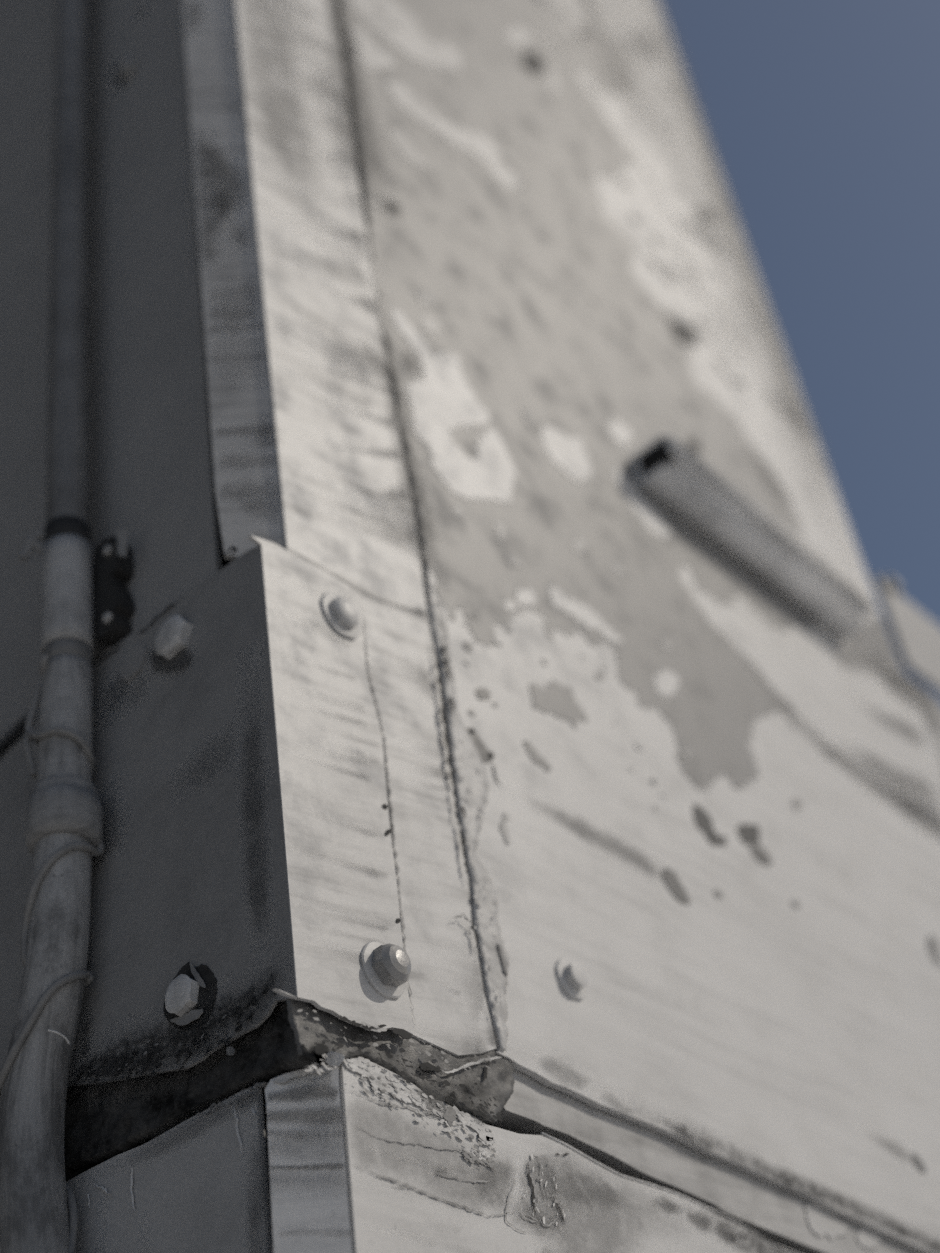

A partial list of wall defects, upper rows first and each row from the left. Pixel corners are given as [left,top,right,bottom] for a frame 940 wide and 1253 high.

peeling [337,0,816,866]
peeling [661,867,691,906]
spalling [273,1051,502,1170]
crack [348,1080,569,1233]